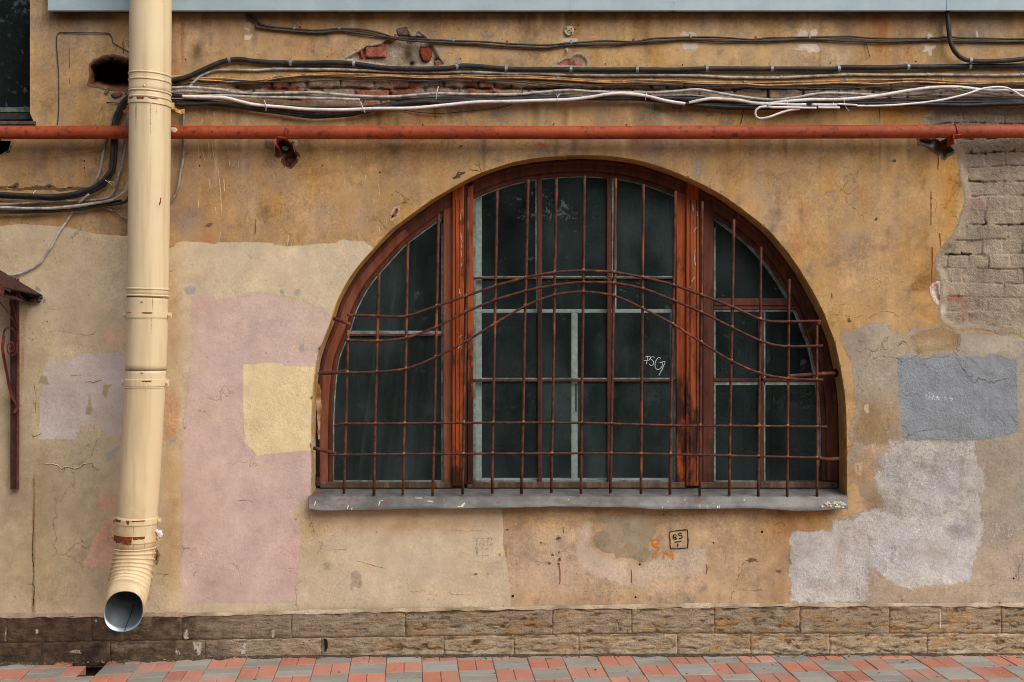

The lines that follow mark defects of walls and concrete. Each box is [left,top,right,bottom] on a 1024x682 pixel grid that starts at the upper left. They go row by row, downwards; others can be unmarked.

spalling [87,54,129,102]
spalling [220,25,1024,125]
flaking render [776,138,1024,607]
peeling [85,384,111,415]
crack [45,445,95,470]